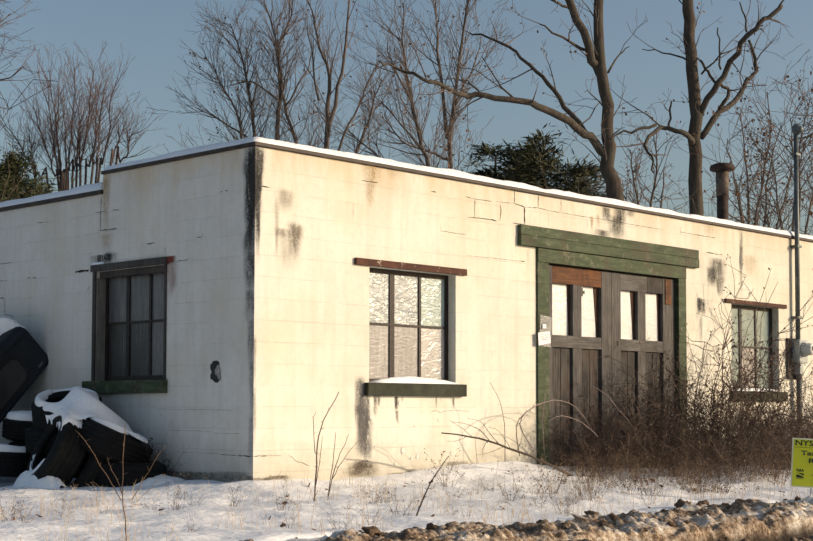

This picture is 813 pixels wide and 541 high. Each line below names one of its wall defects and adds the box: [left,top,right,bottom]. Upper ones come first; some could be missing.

damp [244,146,264,284]
damp [708,261,723,291]
spalling [210,361,221,383]
damp [356,380,380,450]
damp [349,460,373,476]